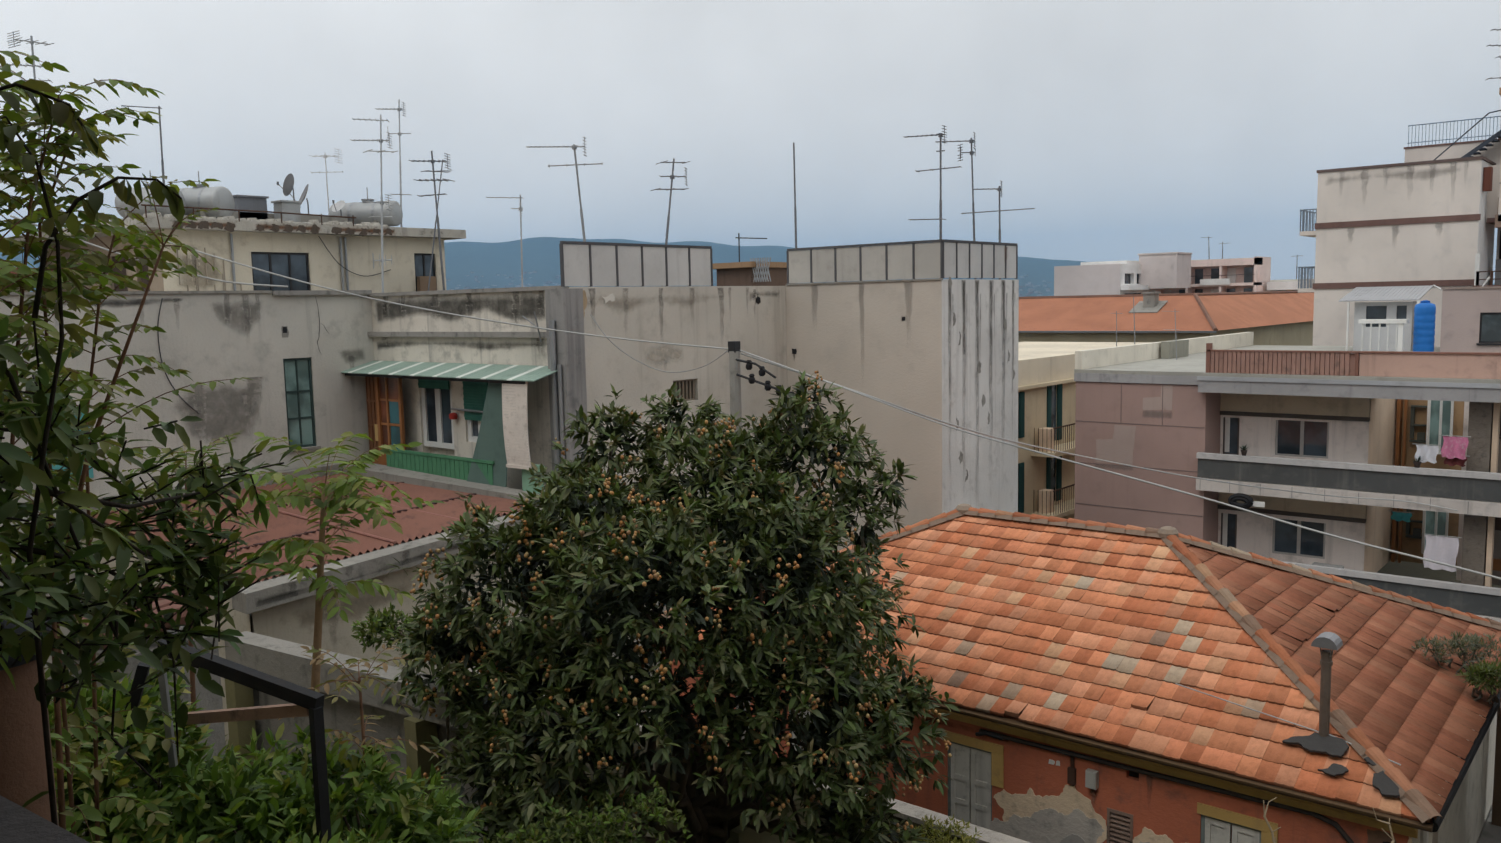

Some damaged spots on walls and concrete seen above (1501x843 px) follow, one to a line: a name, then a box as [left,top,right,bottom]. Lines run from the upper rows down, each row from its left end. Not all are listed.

flaking render [989,784,1108,843]
flaking render [1131,827,1174,843]